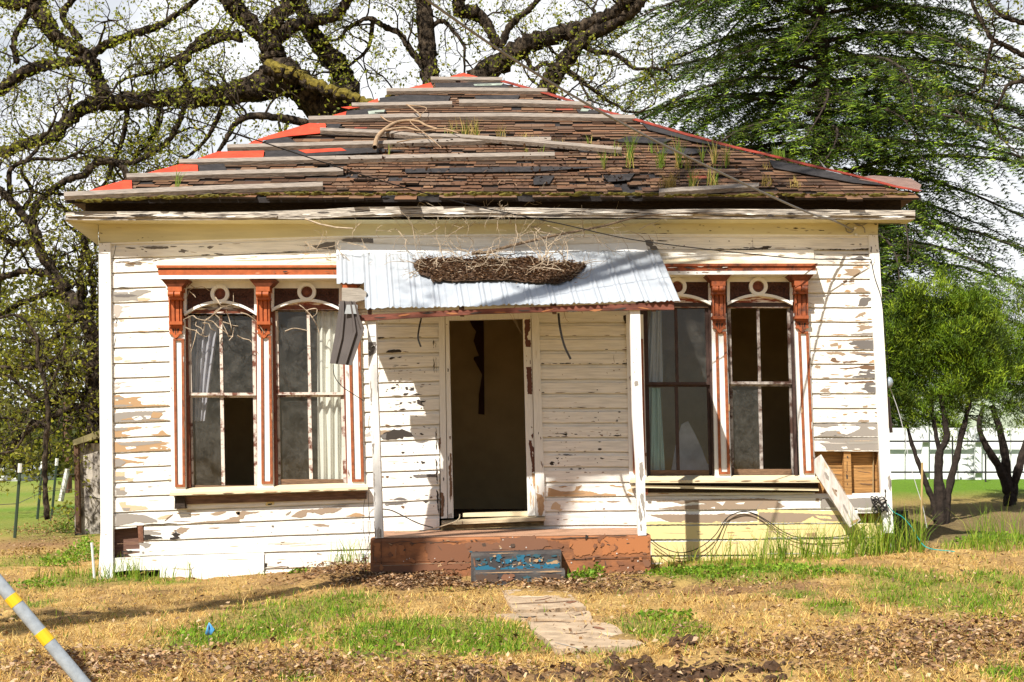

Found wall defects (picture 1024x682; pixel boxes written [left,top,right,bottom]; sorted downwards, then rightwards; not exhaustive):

peeling [124,237,224,265]
peeling [288,238,373,255]
peeling [524,244,892,545]
peeling [107,382,172,511]
peeling [359,337,452,517]
peeling [139,510,272,561]
peeling [291,505,365,540]
spalling [469,537,572,585]